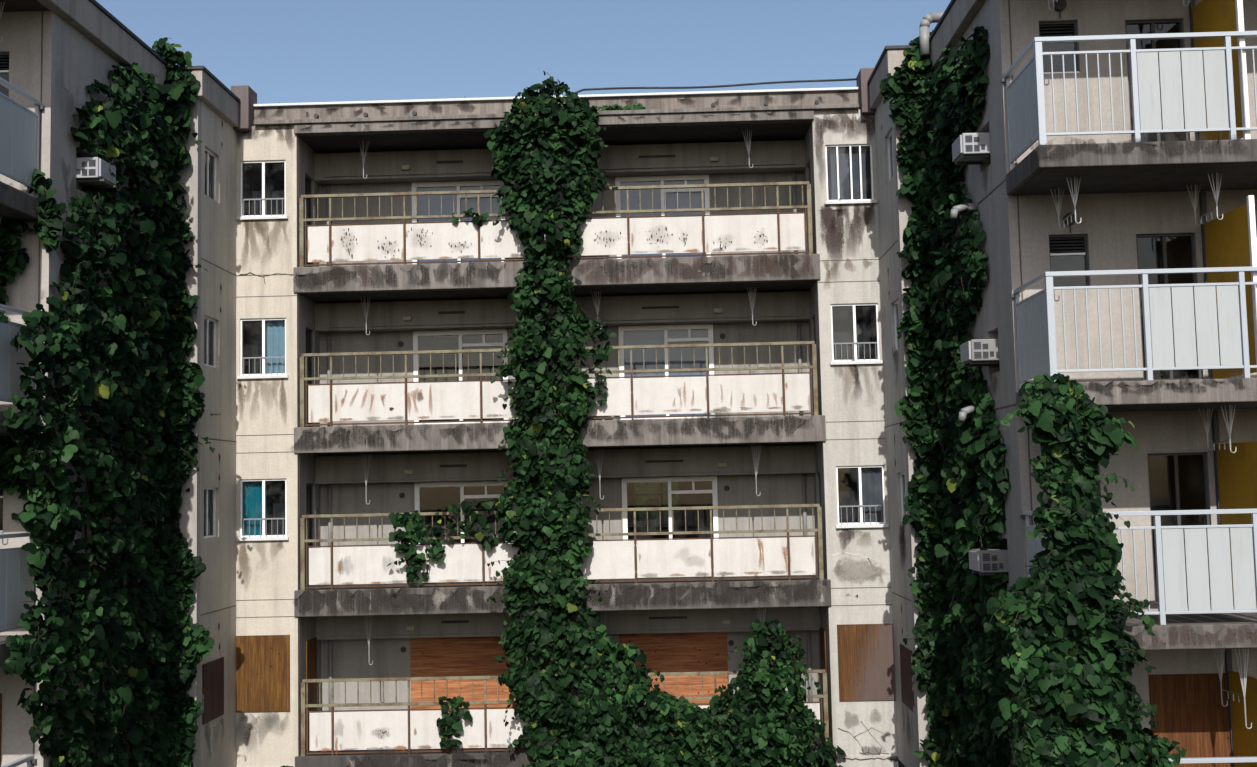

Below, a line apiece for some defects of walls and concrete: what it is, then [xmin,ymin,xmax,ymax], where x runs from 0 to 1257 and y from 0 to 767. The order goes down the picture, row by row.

water stain [238,107,337,139]
water stain [406,102,441,126]
water stain [294,584,502,613]
water stain [585,575,820,606]
crack [838,721,898,762]